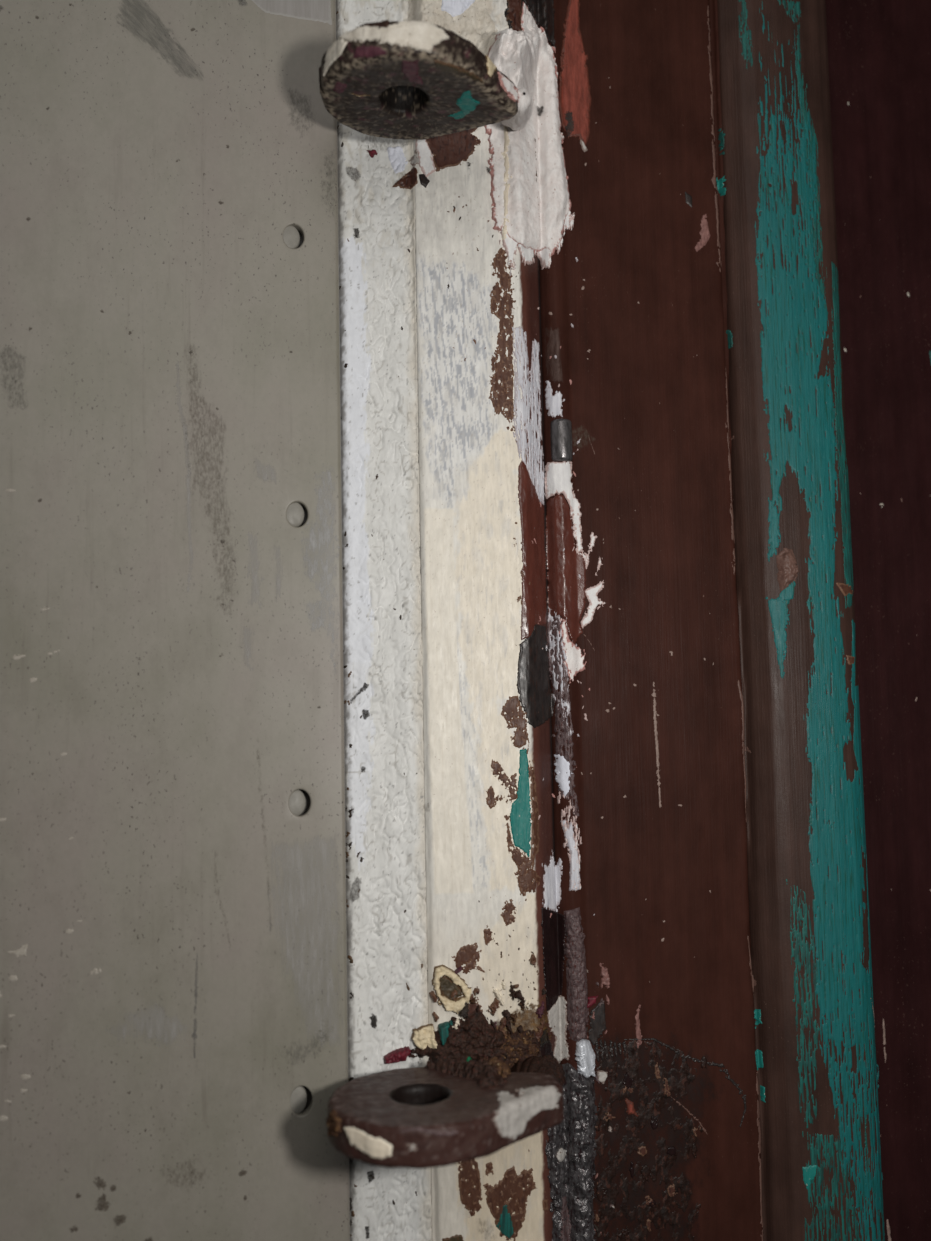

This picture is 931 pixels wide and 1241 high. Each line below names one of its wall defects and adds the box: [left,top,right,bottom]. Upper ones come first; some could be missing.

peeling [506,0,522,31]
peeling [489,240,516,430]
peeling [725,374,736,573]
peeling [516,461,603,651]
peeling [738,0,891,1241]
peeling [451,696,543,974]
peeling [557,791,582,892]
rust [408,927,553,1071]
peeling [492,1086,562,1140]
peeling [540,1040,554,1057]
peeling [458,1159,549,1241]